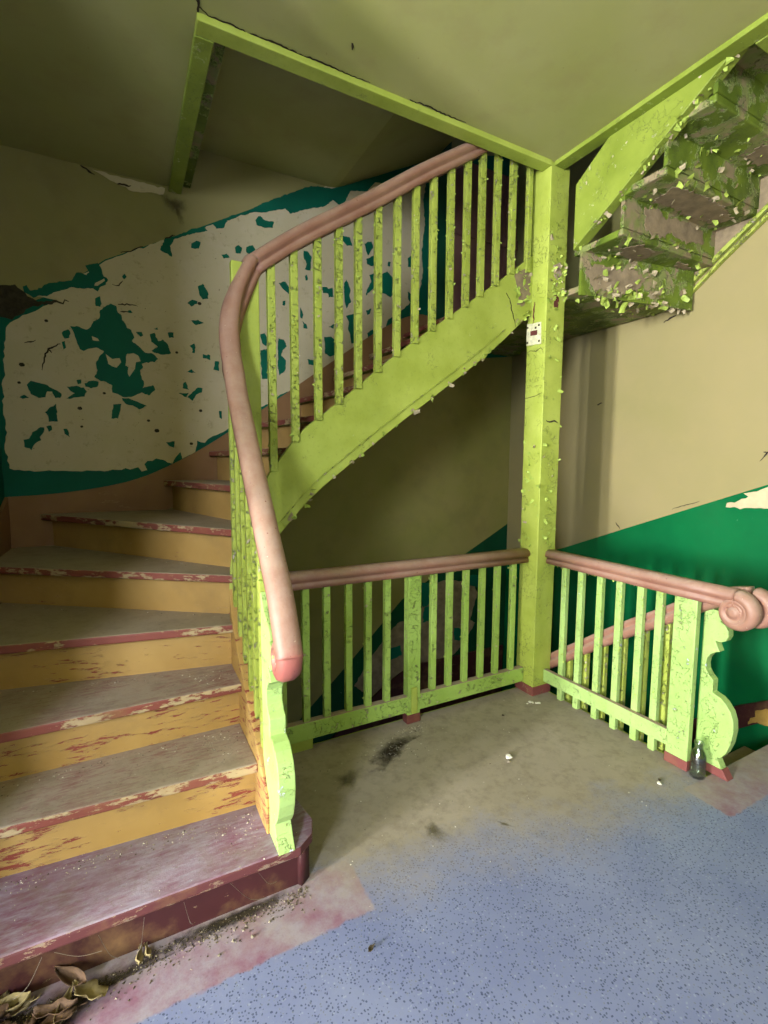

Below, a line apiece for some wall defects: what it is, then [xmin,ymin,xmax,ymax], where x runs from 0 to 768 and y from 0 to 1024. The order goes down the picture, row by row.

crack [80,165,131,187]
peeling [630,54,740,176]
peeling [0,162,422,472]
peeling [259,160,532,407]
peeling [547,135,768,342]
peeling [518,424,562,547]
peeling [726,487,768,509]